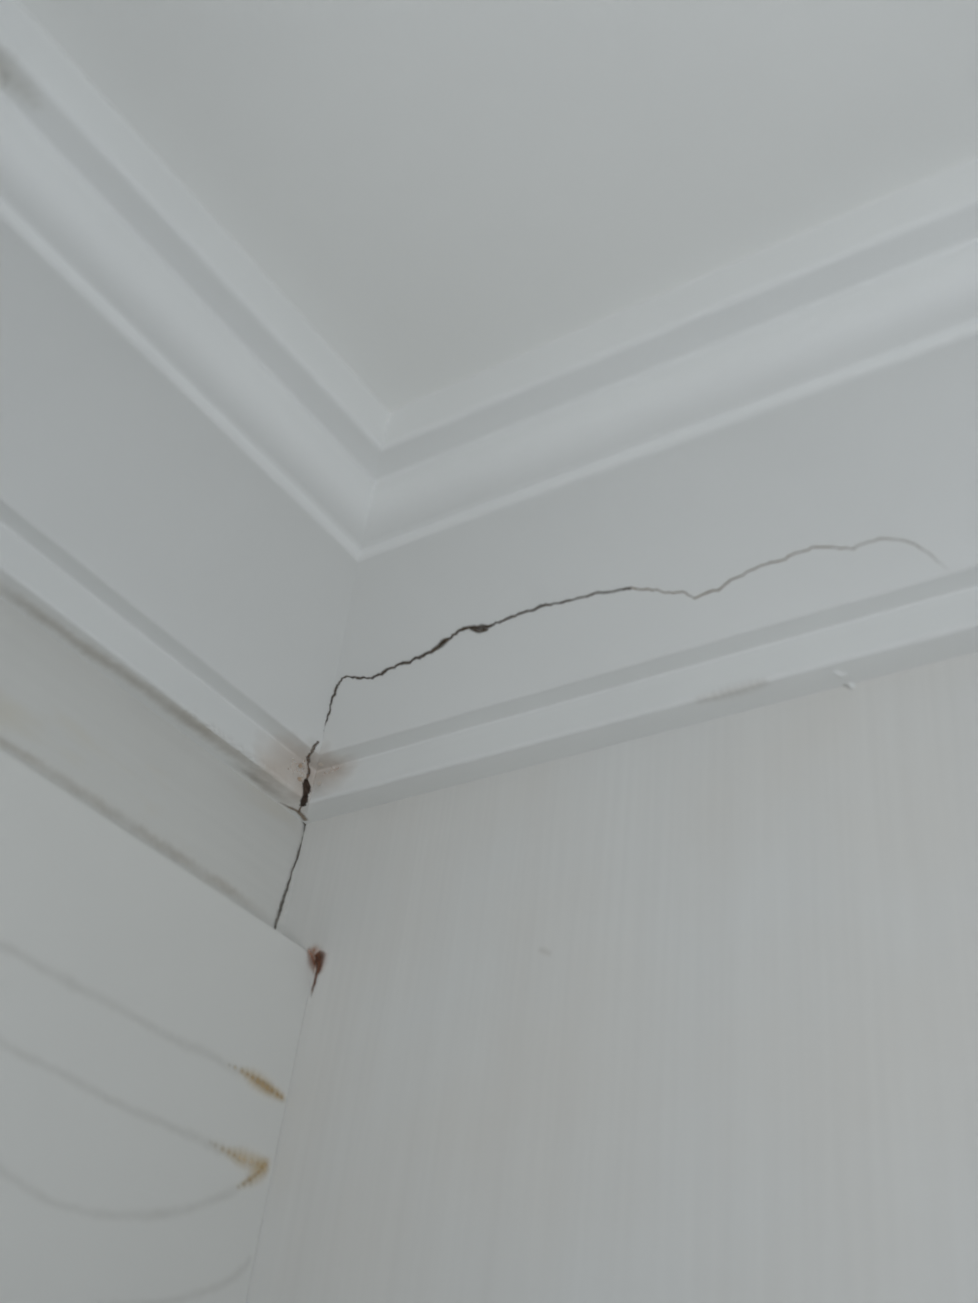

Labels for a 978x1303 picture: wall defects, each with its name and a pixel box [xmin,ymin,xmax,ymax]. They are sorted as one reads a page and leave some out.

crack [325,538,921,725]
crack [274,807,307,930]
rust [308,949,323,992]